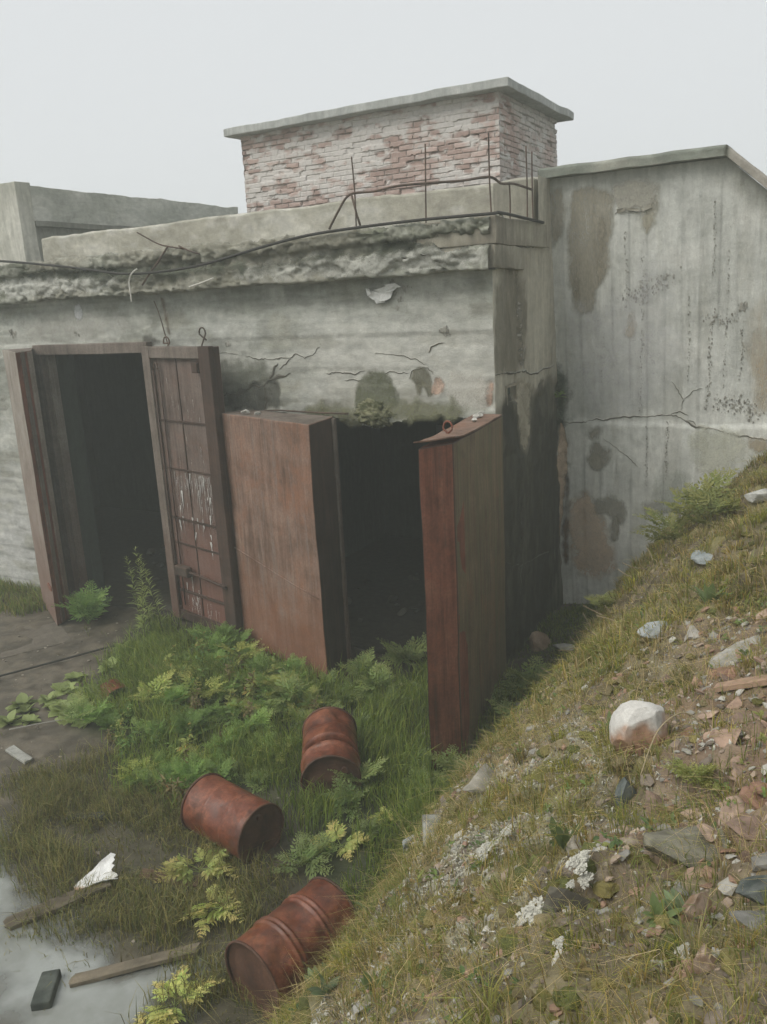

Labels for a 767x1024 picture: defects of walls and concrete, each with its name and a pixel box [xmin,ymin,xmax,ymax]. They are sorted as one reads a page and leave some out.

damp [551,187,612,313]
peeling [366,283,400,304]
damp [221,363,280,411]
crack [221,342,444,410]
damp [412,367,432,400]
crack [563,382,767,467]
damp [495,270,560,656]
damp [587,428,609,470]
damp [593,497,625,541]